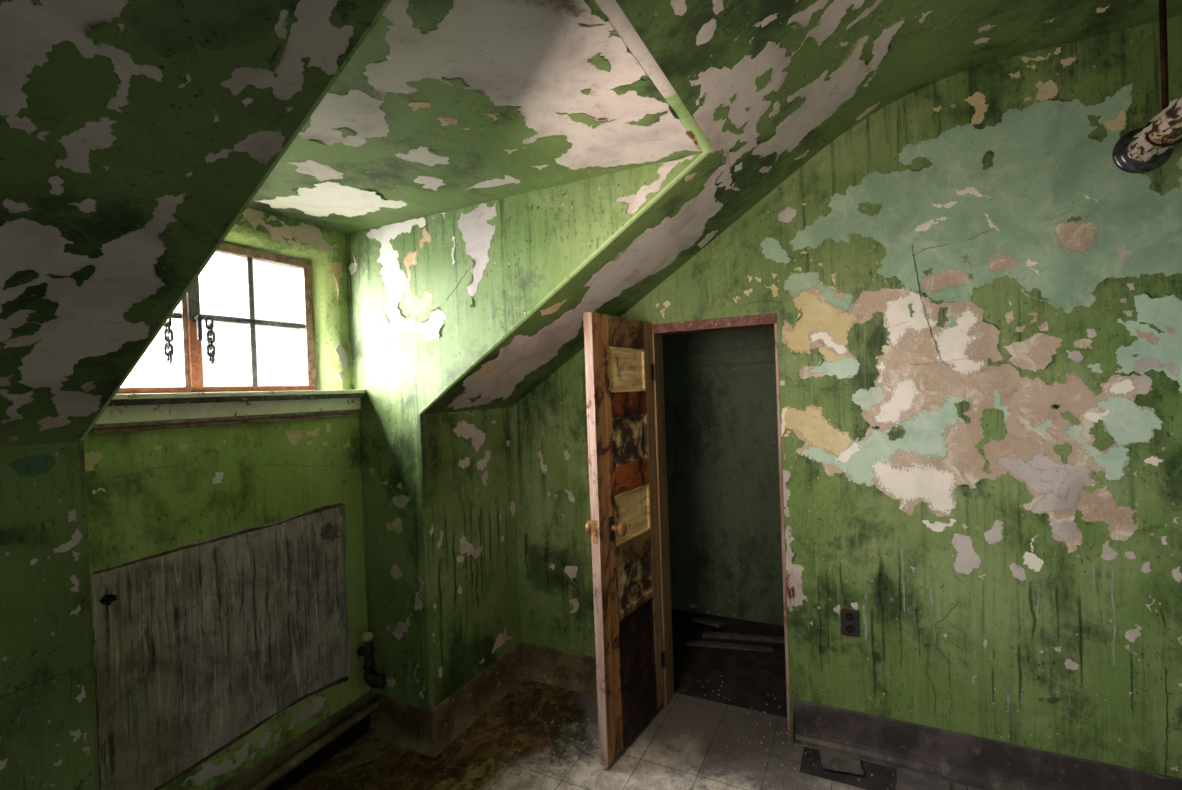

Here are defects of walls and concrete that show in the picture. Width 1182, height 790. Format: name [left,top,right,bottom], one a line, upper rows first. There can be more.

peeling [0,0,163,213]
peeling [220,0,355,111]
peeling [205,131,447,341]
peeling [299,0,932,487]
peeling [0,193,186,441]
damp [432,512,507,660]
peeling [549,564,578,582]
damp [862,604,885,684]
damp [899,545,919,635]
peeling [1039,646,1079,670]
peeling [1125,626,1142,655]
peeling [800,746,897,790]